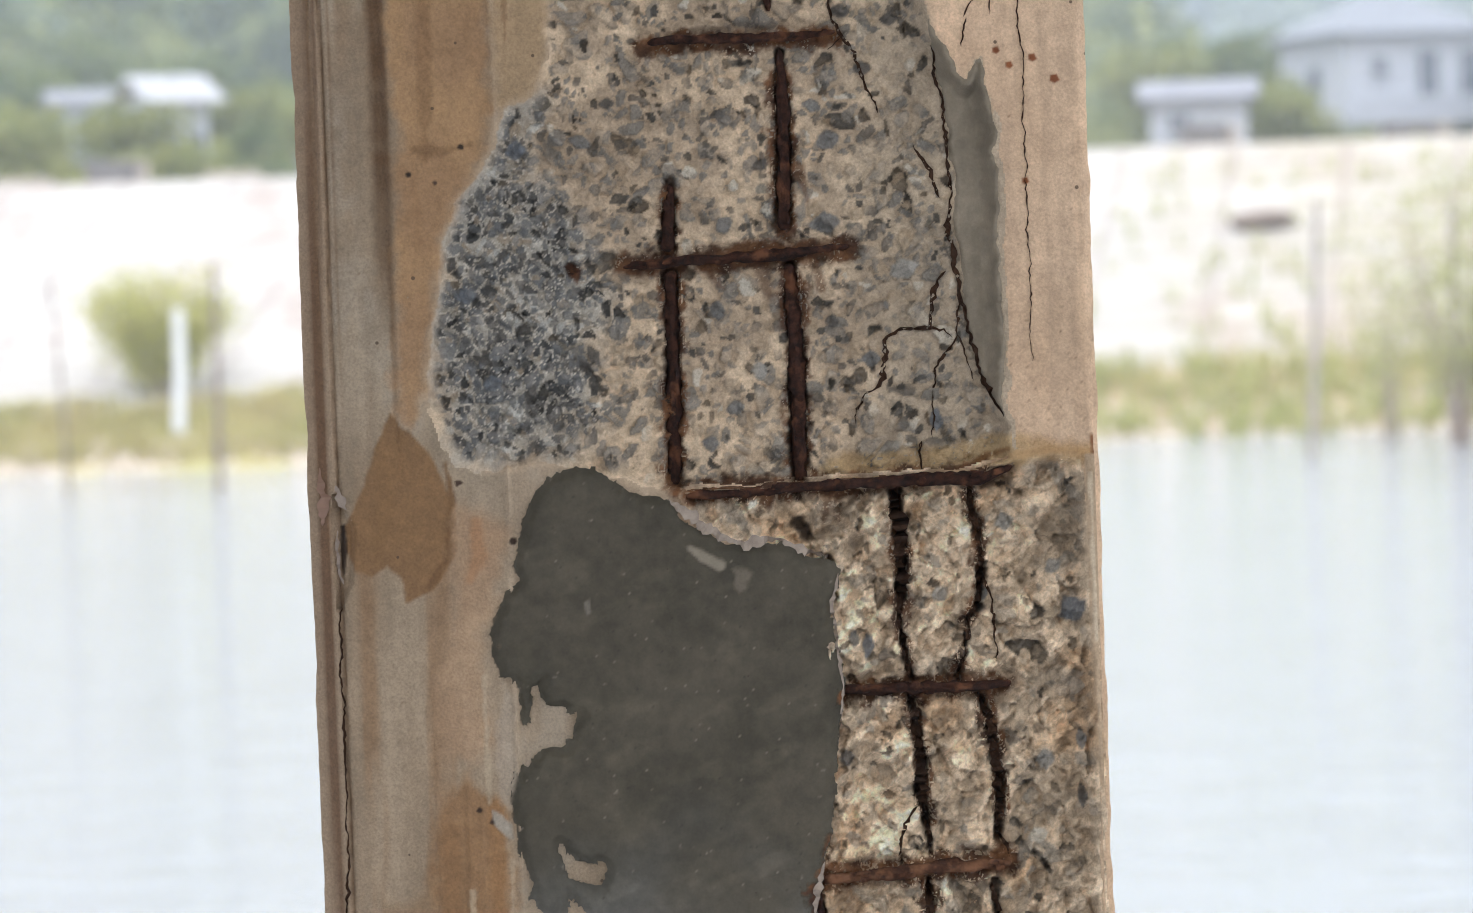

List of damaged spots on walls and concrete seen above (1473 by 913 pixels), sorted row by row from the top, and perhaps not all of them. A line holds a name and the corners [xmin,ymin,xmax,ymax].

spalling [427,0,1109,913]
corrosion [559,14,1094,913]
crack [827,0,878,113]
crack [854,0,1034,913]